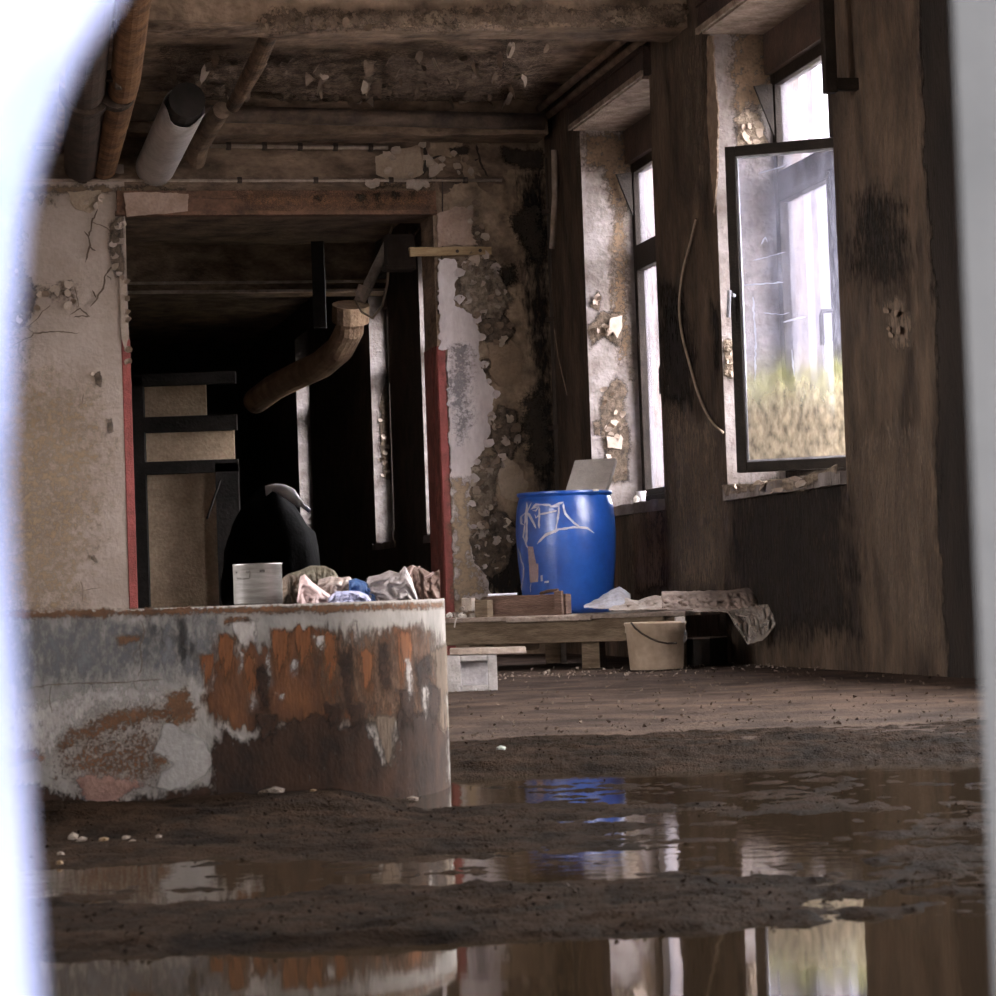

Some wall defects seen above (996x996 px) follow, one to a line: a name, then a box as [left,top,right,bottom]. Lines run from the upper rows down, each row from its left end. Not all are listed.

peeling [365,142,479,191]
peeling [706,36,720,215]
peeling [733,105,769,146]
crack [14,209,112,352]
peeling [587,291,623,347]
peeling [436,199,529,612]
peeling [593,377,631,483]
rust [15,600,446,803]
spalling [76,774,144,802]
peeling [152,723,212,791]